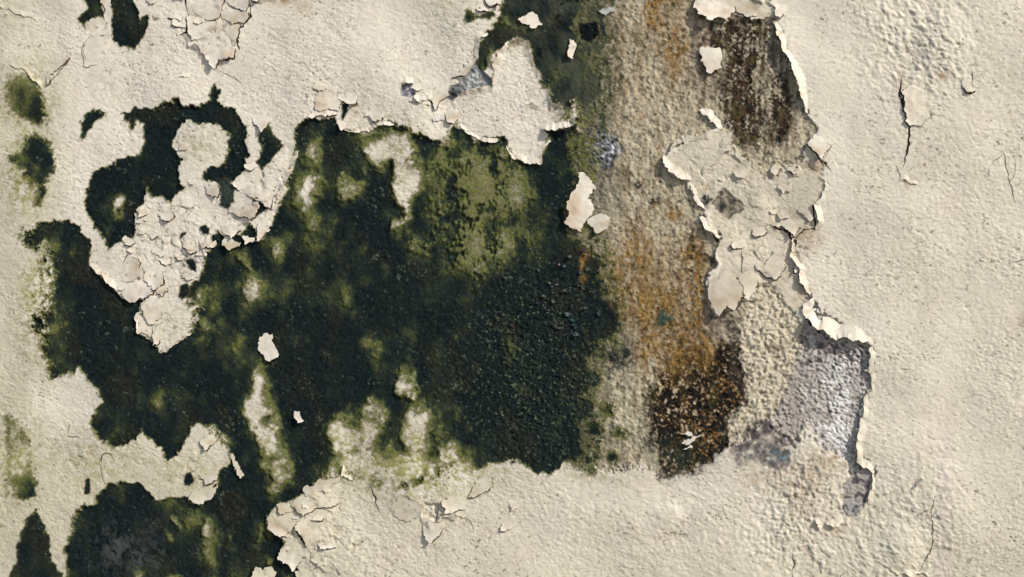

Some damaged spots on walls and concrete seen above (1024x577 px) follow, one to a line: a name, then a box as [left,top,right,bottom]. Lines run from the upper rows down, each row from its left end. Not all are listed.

peeling [45,0,113,88]
peeling [146,0,276,83]
corrosion [645,0,661,30]
corrosion [663,28,687,74]
peeling [306,83,394,133]
peeling [89,151,298,353]
peeling [258,333,279,361]
damp [3,0,631,577]
flaking render [400,0,876,516]
corrosion [615,237,715,372]
peeling [252,465,355,577]
peeling [369,469,494,544]